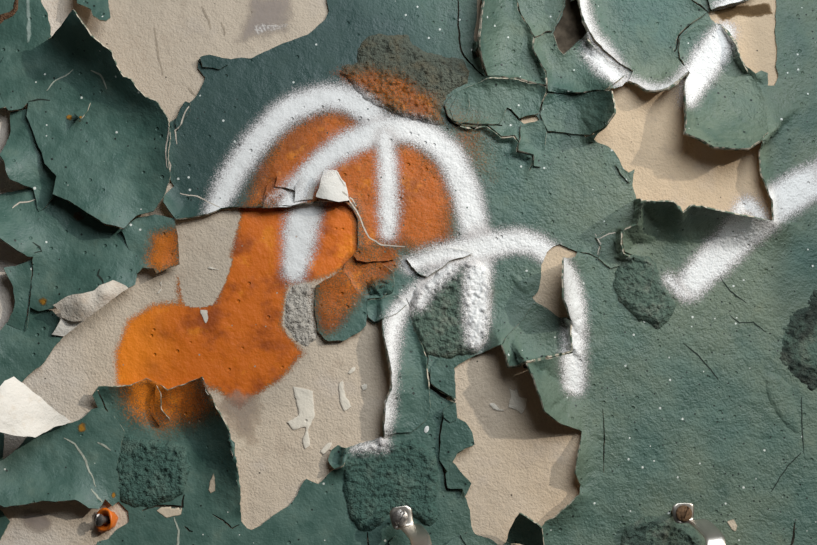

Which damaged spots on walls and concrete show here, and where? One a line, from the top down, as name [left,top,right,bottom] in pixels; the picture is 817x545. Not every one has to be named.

peeling [0,0,329,545]
peeling [296,170,349,202]
peeling [206,239,581,545]
peeling [339,0,778,220]